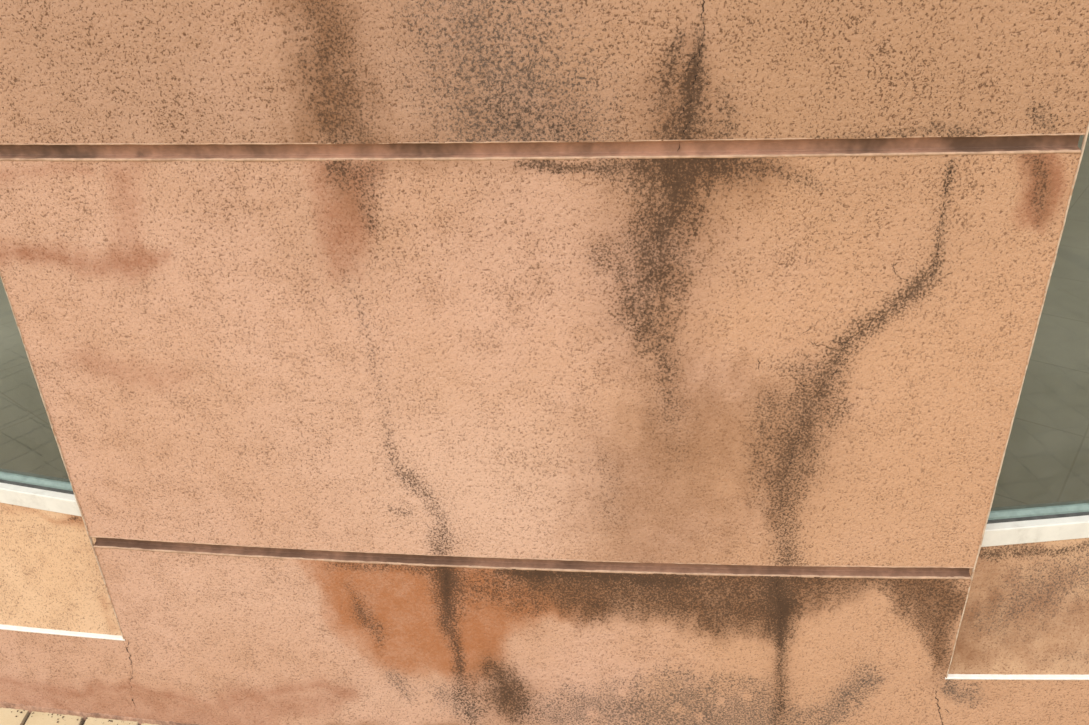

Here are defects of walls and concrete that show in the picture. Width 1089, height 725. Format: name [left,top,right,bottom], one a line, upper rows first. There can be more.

leakage [243,0,655,144]
leakage [0,161,178,290]
crack [614,0,781,369]
leakage [53,336,203,404]
crack [338,280,465,556]
leakage [295,153,1089,725]
crack [746,155,965,719]
leakage [0,503,88,536]
rust [286,559,594,691]
leakage [0,666,396,725]
crack [376,667,483,725]